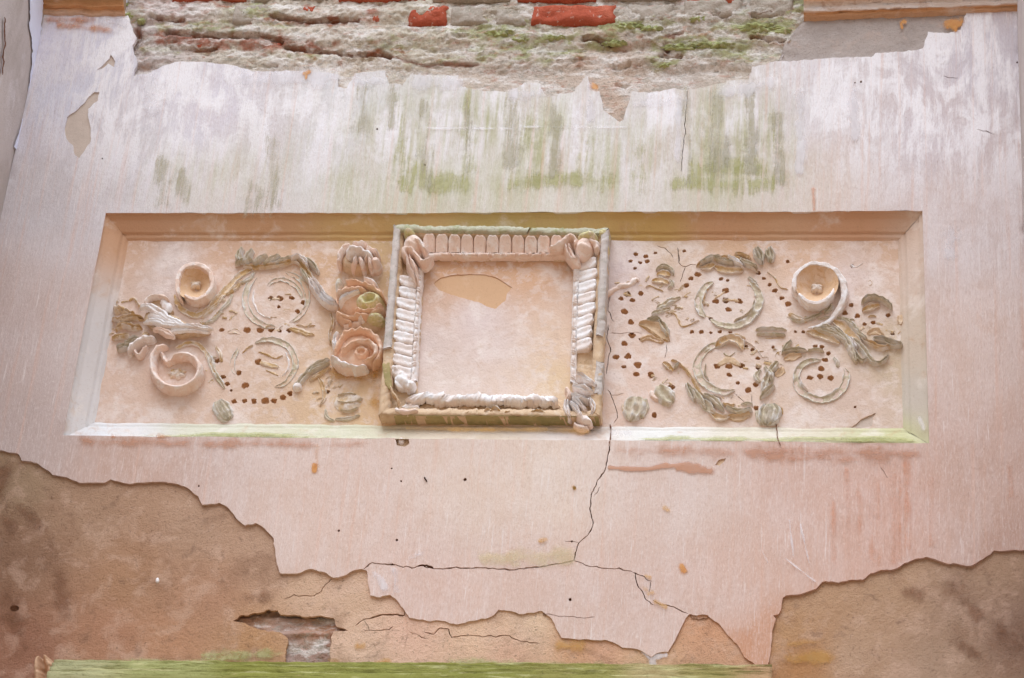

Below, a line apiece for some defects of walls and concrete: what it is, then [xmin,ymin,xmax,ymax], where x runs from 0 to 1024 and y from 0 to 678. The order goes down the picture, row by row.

spalling [125,0,965,122]
flaking render [65,93,99,158]
leakage [550,109,563,177]
flaking render [434,274,512,309]
crack [367,304,634,571]
flaking render [0,451,754,678]
flaking render [768,551,1024,678]